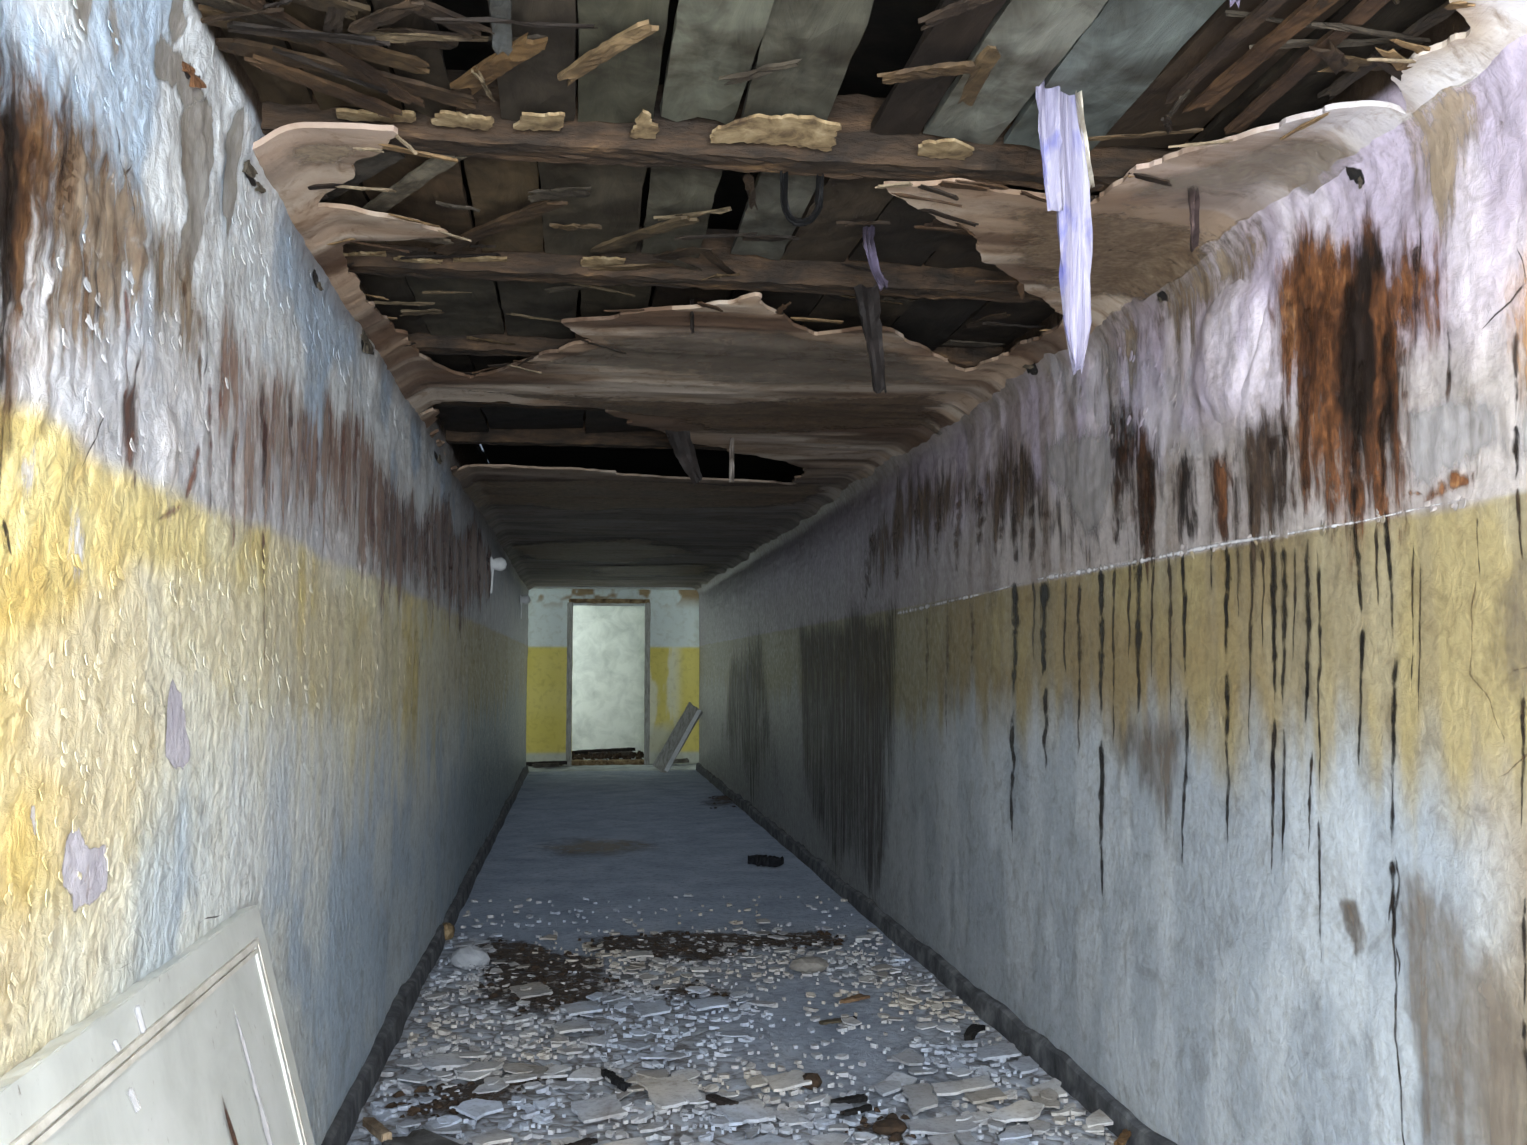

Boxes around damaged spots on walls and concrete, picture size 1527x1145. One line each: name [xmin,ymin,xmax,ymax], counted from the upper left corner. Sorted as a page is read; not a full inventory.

corrosion [0,40,75,485]
peeling [135,0,403,439]
spalling [1346,167,1365,189]
corrosion [122,290,140,480]
corrosion [160,310,491,634]
damp [865,433,1026,590]
corrosion [1011,212,1474,935]
peeling [1038,401,1495,585]
crack [1470,585,1495,718]
peeling [3,742,115,939]
damp [1341,902,1361,952]
damp [1409,884,1527,1145]